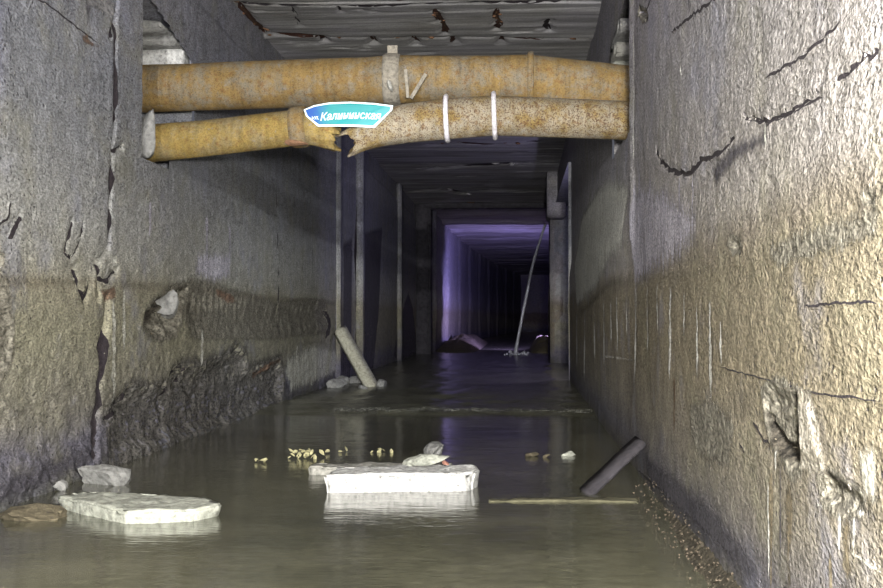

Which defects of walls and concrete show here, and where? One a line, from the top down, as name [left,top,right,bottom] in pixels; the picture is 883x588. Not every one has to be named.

crack [234,0,584,43]
crack [671,0,718,34]
crack [766,18,842,80]
crack [657,45,880,180]
crack [435,140,539,167]
crack [36,0,125,461]
crack [323,310,331,340]
crack [351,205,359,343]
crack [805,297,877,310]
spalling [103,279,329,466]
crack [720,366,880,404]
spalling [760,376,865,521]